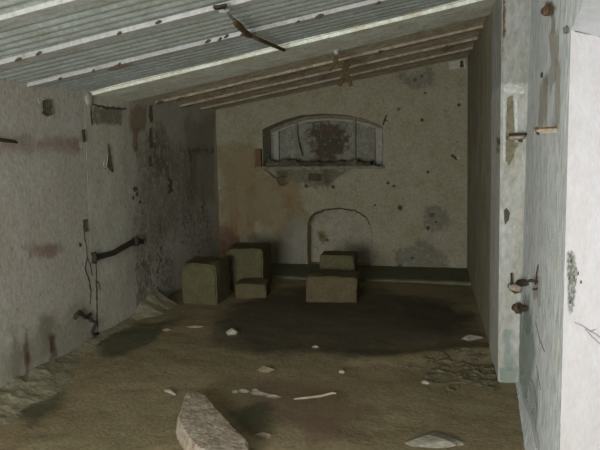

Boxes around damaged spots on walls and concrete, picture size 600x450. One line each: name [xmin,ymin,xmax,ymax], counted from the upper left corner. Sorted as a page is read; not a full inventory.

spalling [38,97,53,117]
peeling [503,83,525,168]
peeling [103,144,114,172]
crack [83,233,101,332]
damp [567,252,582,312]